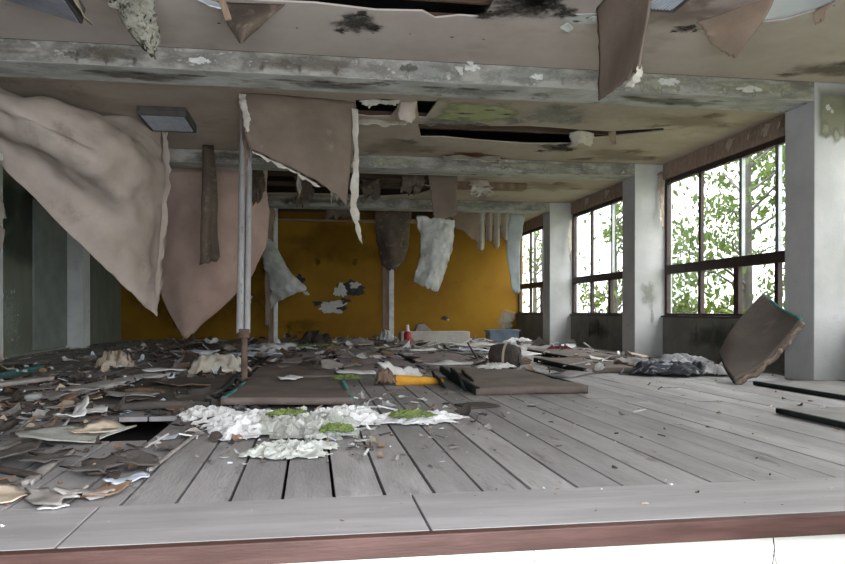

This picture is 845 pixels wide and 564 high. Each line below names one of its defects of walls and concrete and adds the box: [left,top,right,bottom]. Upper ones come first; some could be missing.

leakage [336,11,380,34]
leakage [477,0,579,22]
leakage [86,49,205,81]
leakage [260,58,374,89]
leakage [806,63,845,75]
leakage [406,64,581,126]
leakage [623,74,792,105]
peeling [296,273,365,314]